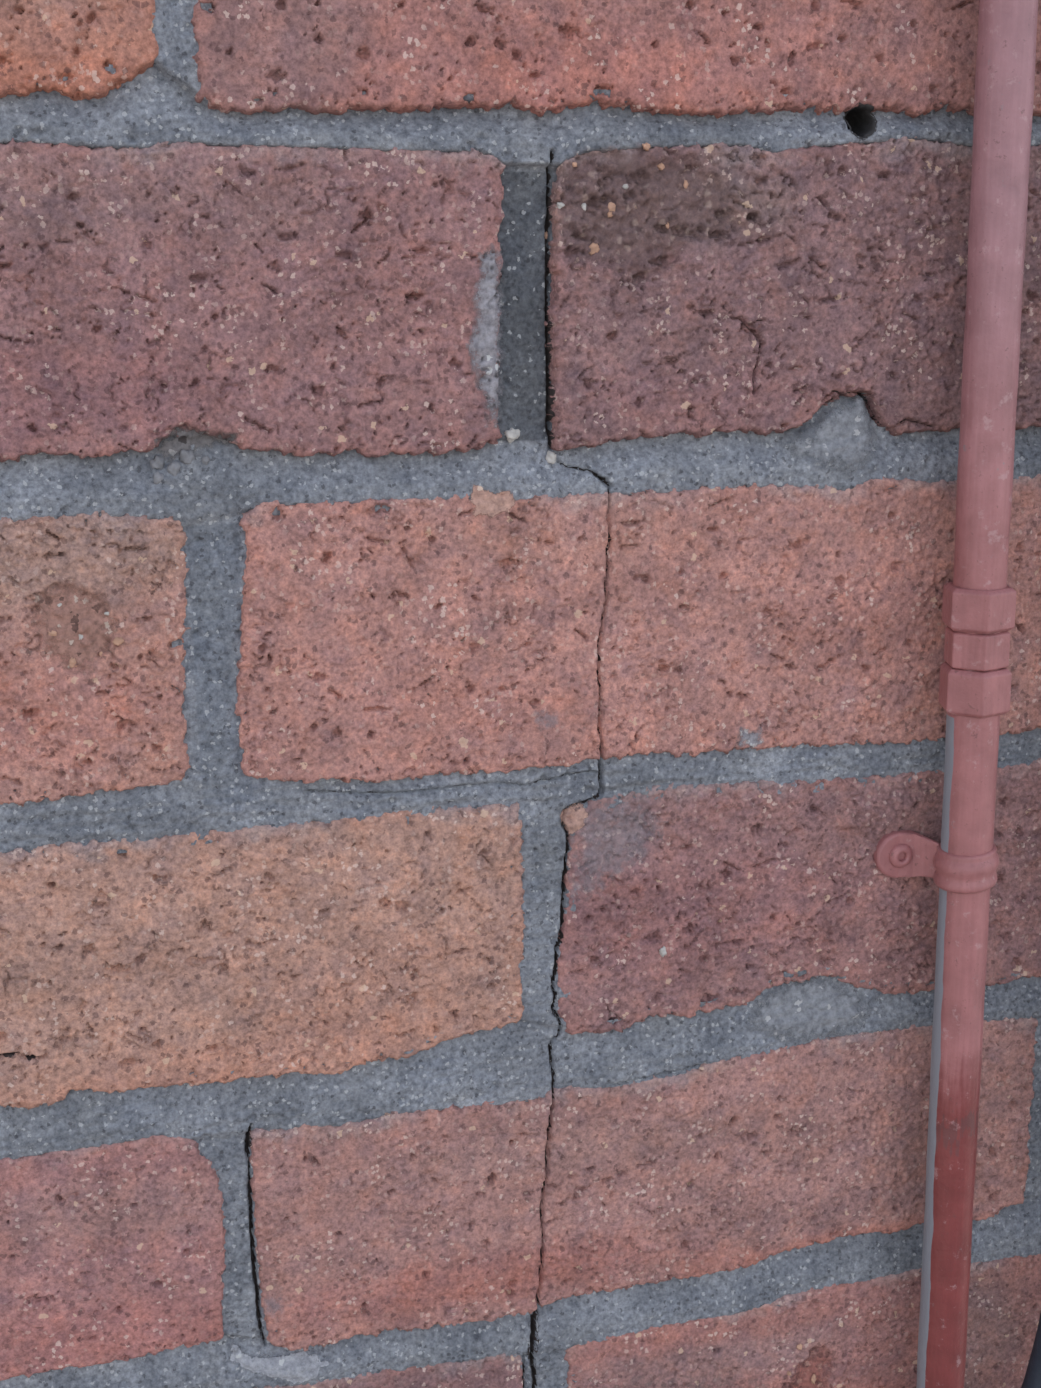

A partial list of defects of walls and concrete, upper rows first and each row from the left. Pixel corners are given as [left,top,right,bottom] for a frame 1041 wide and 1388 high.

crack [245,1125,265,1341]
crack [522,151,611,1388]